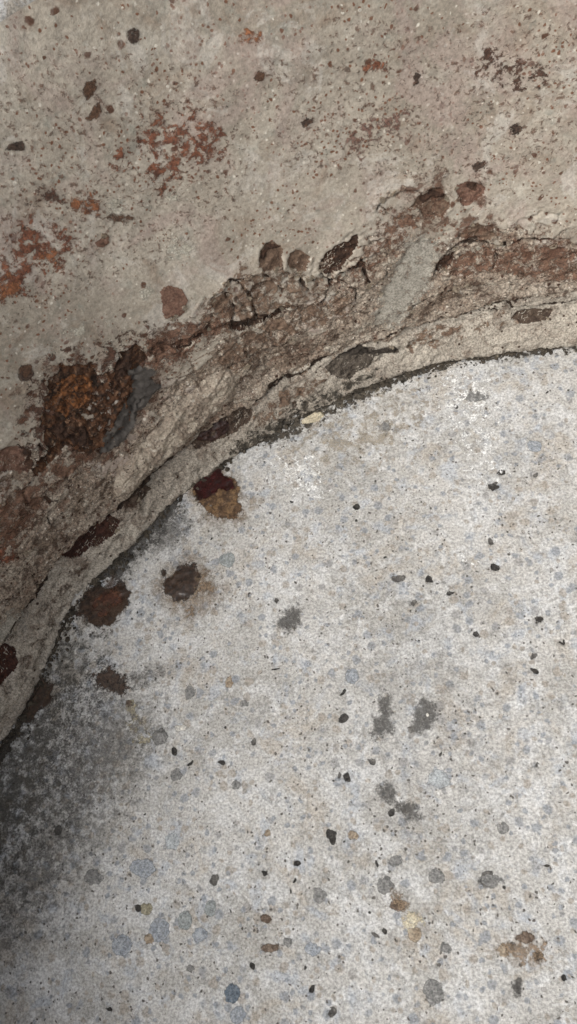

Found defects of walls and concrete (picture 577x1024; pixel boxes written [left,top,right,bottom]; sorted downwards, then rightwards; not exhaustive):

rust [0,27,258,328]
spalling [0,322,212,477]
crack [207,248,390,368]
spalling [258,234,359,274]
spalling [325,344,399,380]
water stain [0,478,137,618]
rust [75,576,131,632]
water stain [97,496,195,582]
rust [159,556,216,618]
rust [190,468,244,524]
crack [0,346,577,762]
water stain [0,618,163,949]